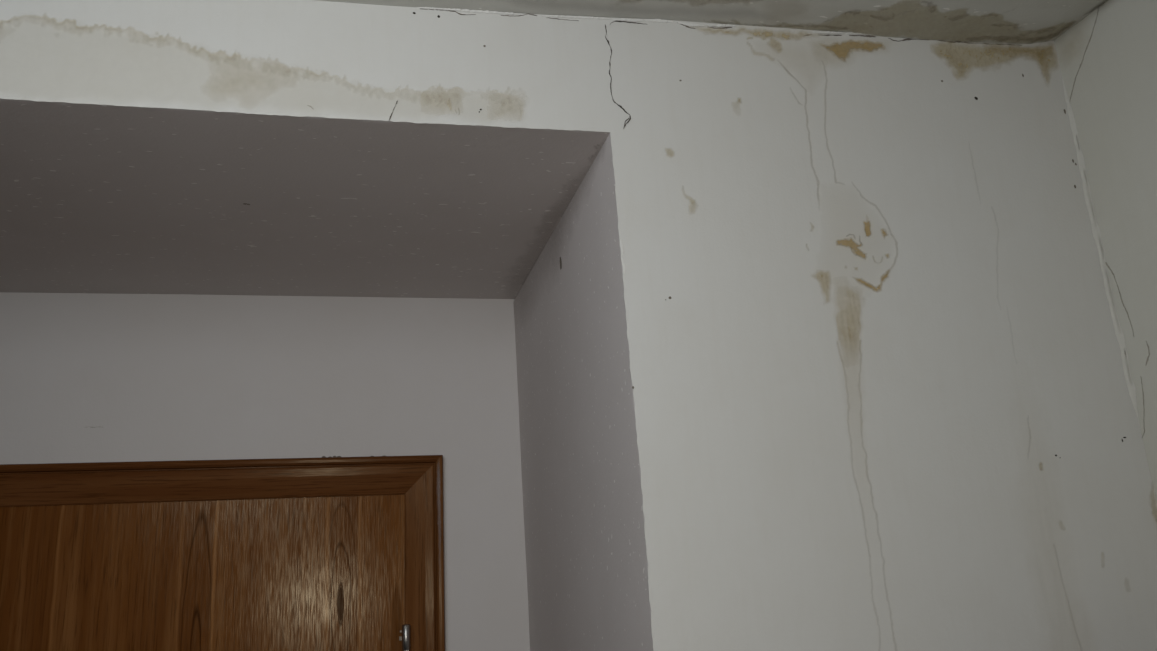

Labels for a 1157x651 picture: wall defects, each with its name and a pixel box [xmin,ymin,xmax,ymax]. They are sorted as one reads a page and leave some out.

crack [429,9,642,129]
peeling [837,222,886,258]